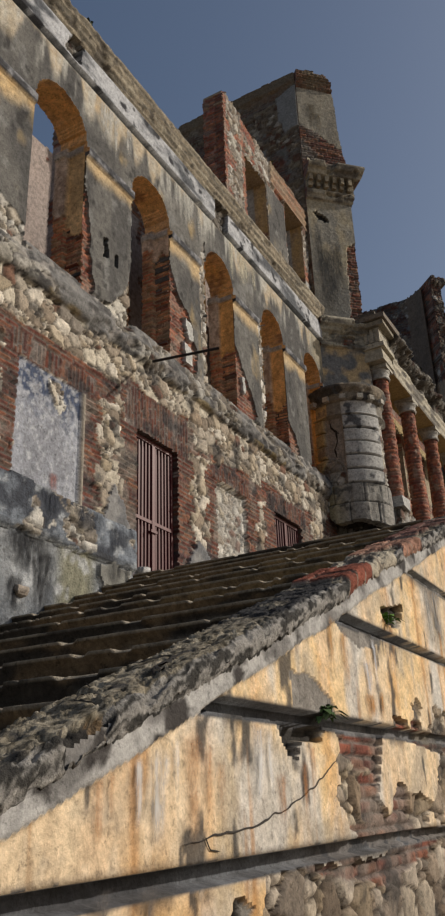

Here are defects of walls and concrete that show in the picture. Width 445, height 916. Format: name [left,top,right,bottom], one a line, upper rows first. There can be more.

spalling [233,320,269,432]
crack [330,424,339,457]
leakage [9,532,52,606]
peeling [188,541,211,563]
spalling [337,624,381,648]
spalling [380,603,403,628]
crack [129,649,188,675]
crack [73,683,98,705]
spalling [289,668,335,713]
spalling [277,697,445,837]
crack [184,760,337,852]
spalling [231,837,445,916]